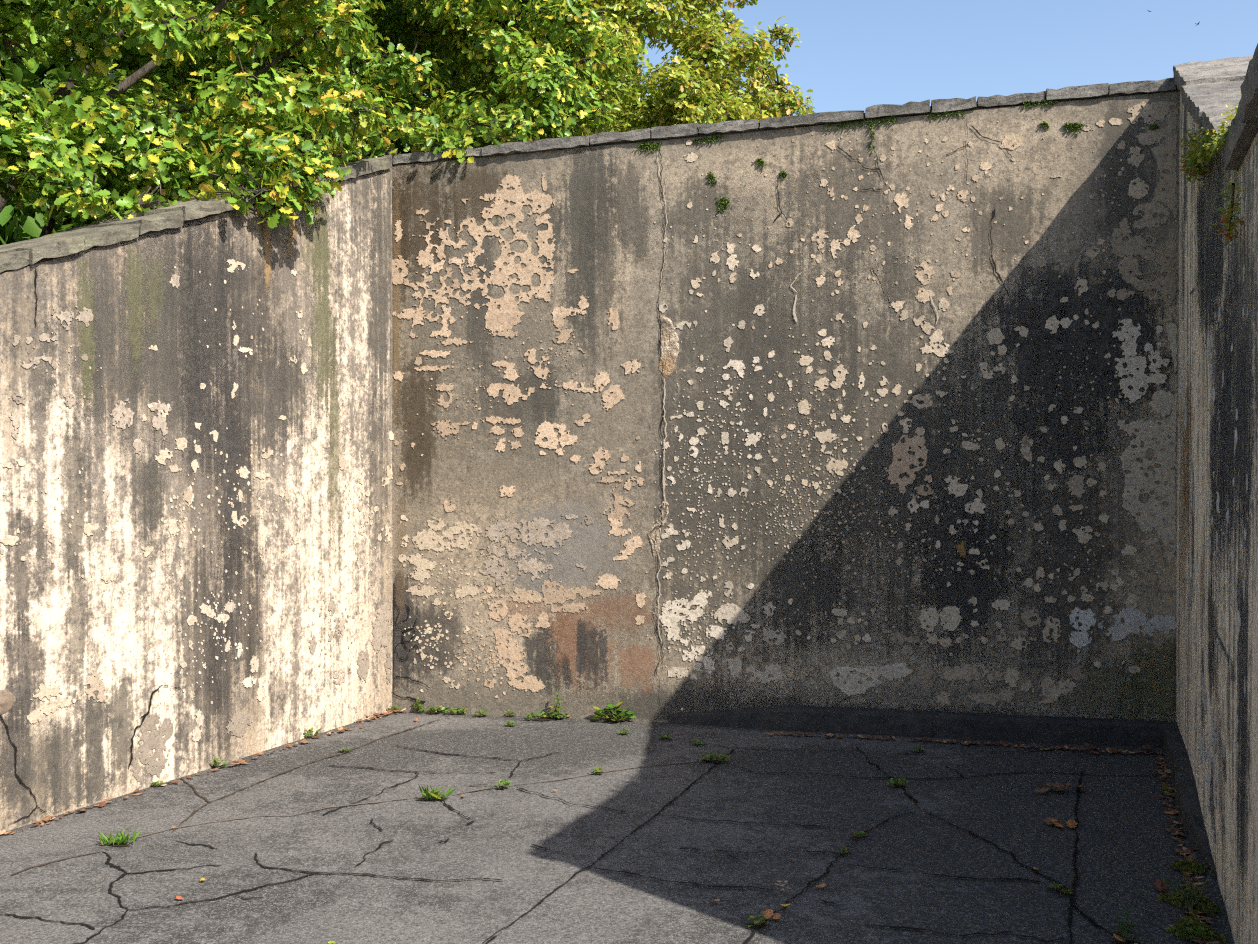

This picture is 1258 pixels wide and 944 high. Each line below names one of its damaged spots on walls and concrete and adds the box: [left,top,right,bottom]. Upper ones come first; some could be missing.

peeling [12,306,102,408]
leakage [78,219,258,586]
peeling [199,259,249,286]
peeling [199,299,264,361]
leakage [368,168,456,495]
crack [652,148,668,713]
peeling [309,101,1249,706]
leakage [981,259,1173,484]
leakage [1183,154,1258,887]
crack [129,685,181,766]
crack [0,745,627,944]
crack [596,746,1140,944]